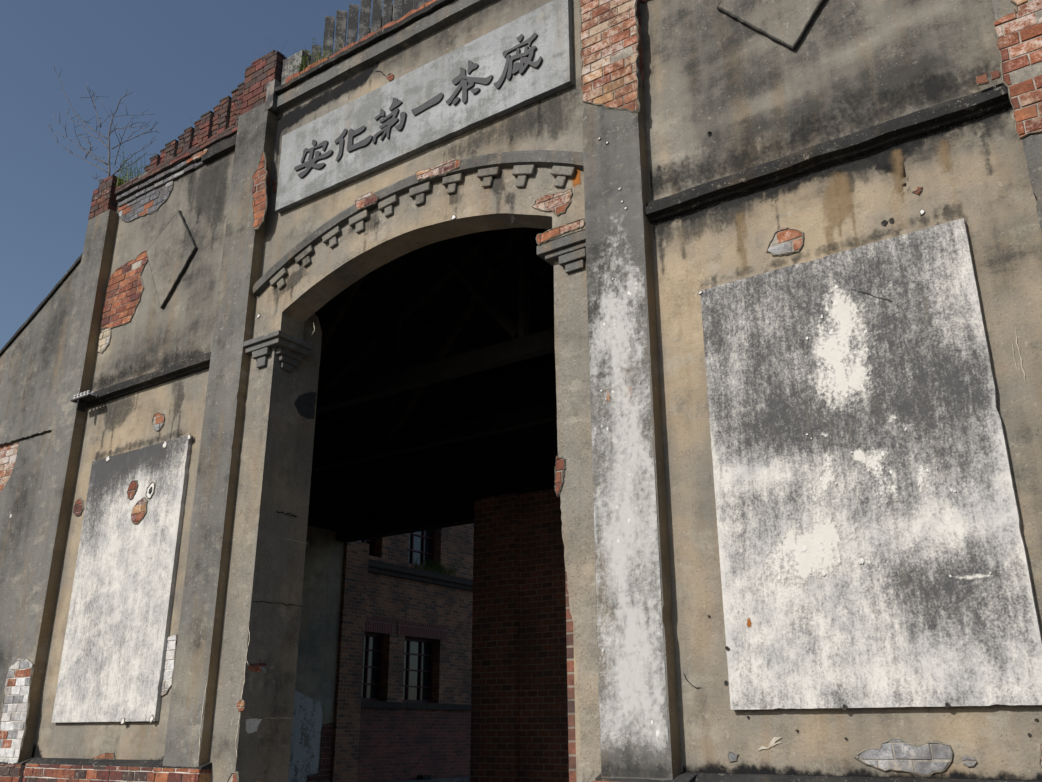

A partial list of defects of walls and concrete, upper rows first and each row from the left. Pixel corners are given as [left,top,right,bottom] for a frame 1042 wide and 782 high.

spalling [580,0,650,113]
spalling [975,0,1042,141]
spalling [252,150,277,231]
spalling [415,159,462,182]
spalling [532,188,586,246]
spalling [766,227,805,257]
water stain [649,65,988,193]
water stain [653,107,1010,271]
spalling [97,250,148,354]
spalling [237,699,263,735]
flaking render [288,690,334,782]
spalling [854,736,977,777]